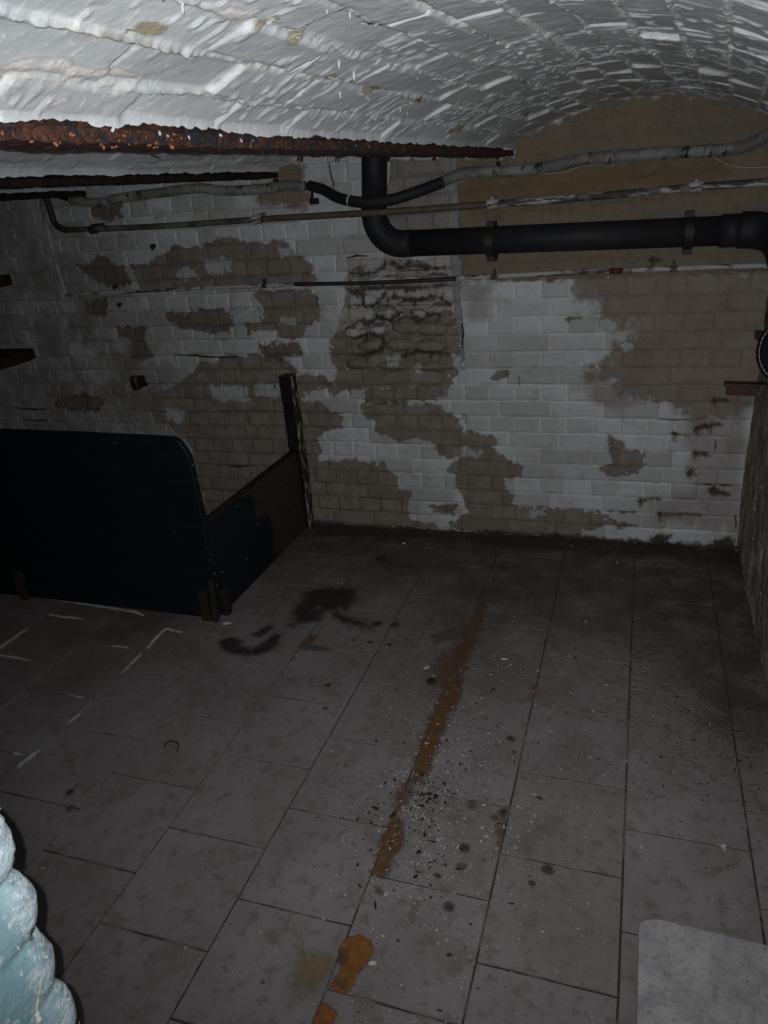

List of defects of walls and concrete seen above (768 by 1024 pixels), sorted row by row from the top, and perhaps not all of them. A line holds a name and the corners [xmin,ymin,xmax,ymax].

rust [91,133,183,158]
peeling [76,237,637,536]
peeling [600,435,646,477]
rust [370,603,485,893]
rust [330,934,374,994]
rust [313,1002,337,1024]